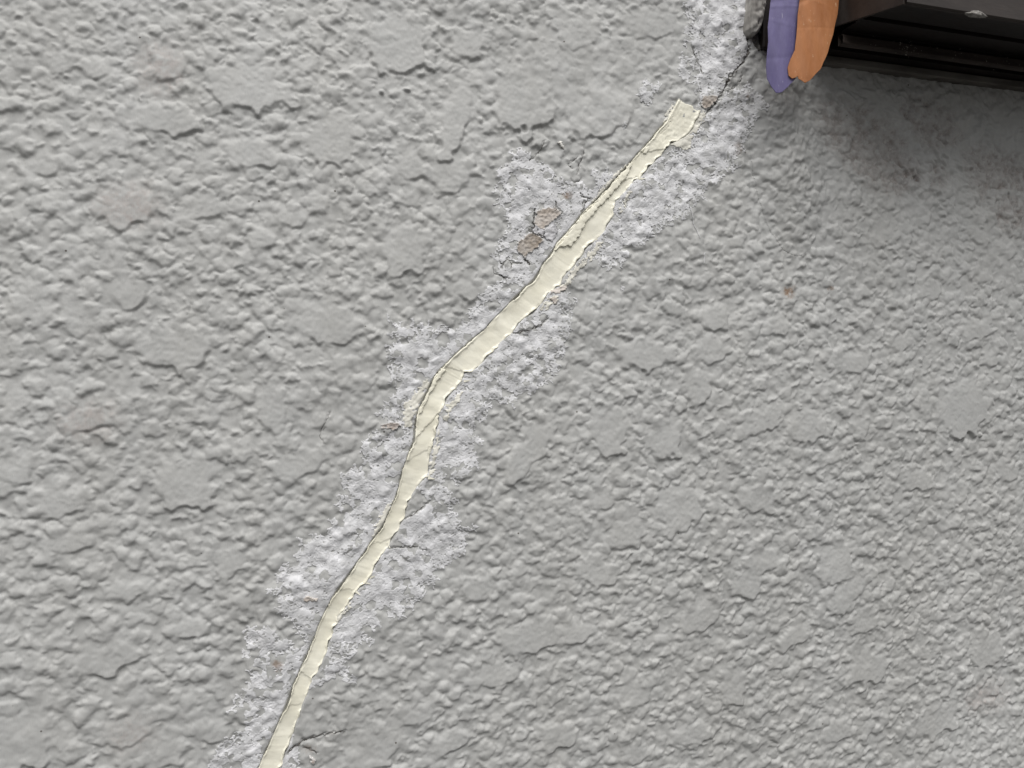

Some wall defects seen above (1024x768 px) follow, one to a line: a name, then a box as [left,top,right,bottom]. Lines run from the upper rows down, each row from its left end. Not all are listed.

peeling [208,147,616,768]
crack [259,38,751,768]